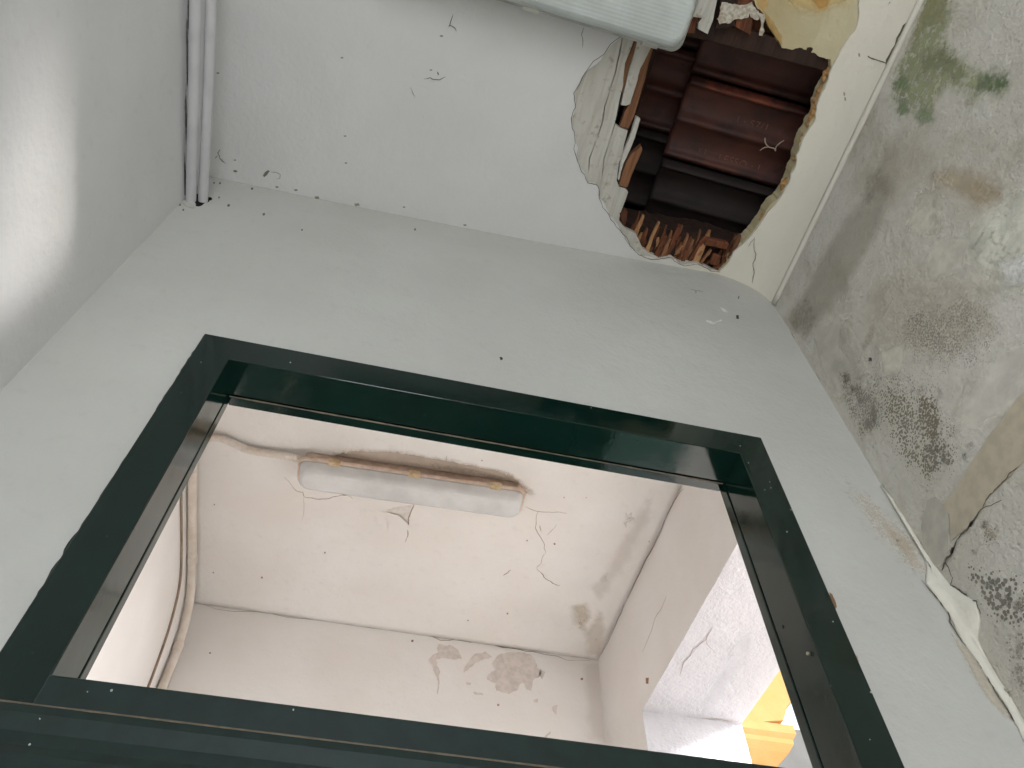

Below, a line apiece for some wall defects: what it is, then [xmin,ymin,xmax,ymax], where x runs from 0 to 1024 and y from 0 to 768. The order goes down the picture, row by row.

water stain [765,14,781,43]
water stain [911,0,946,44]
spalling [717,0,859,271]
water stain [909,190,1024,292]
water stain [814,322,1024,486]
peeling [429,644,545,706]
crack [923,467,1018,722]
water stain [959,550,1024,712]